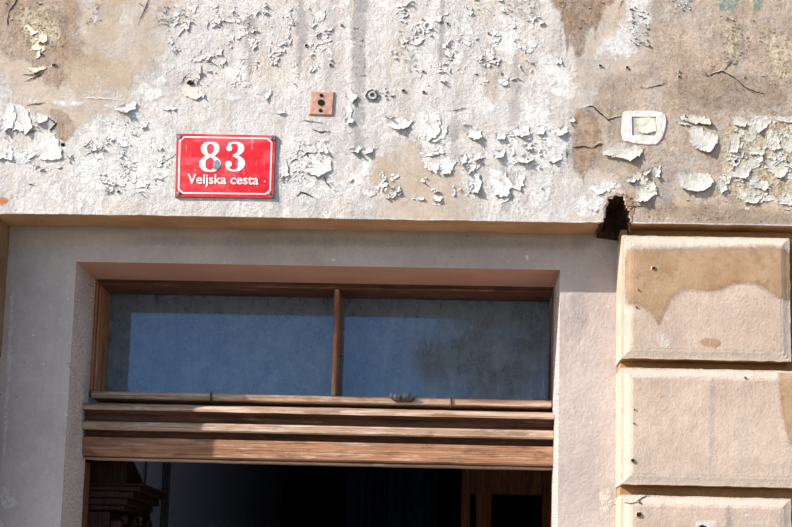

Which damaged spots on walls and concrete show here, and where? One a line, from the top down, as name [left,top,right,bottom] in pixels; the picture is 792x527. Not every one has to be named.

spalling [10,0,67,73]
water stain [0,0,134,144]
peeling [0,101,181,203]
peeling [154,4,198,53]
peeling [180,1,268,100]
peeling [308,7,332,72]
peeling [362,172,401,198]
flaking render [385,0,792,241]
water stain [551,0,655,94]
crack [704,61,765,94]
water stain [624,240,790,349]
water stain [776,373,792,445]